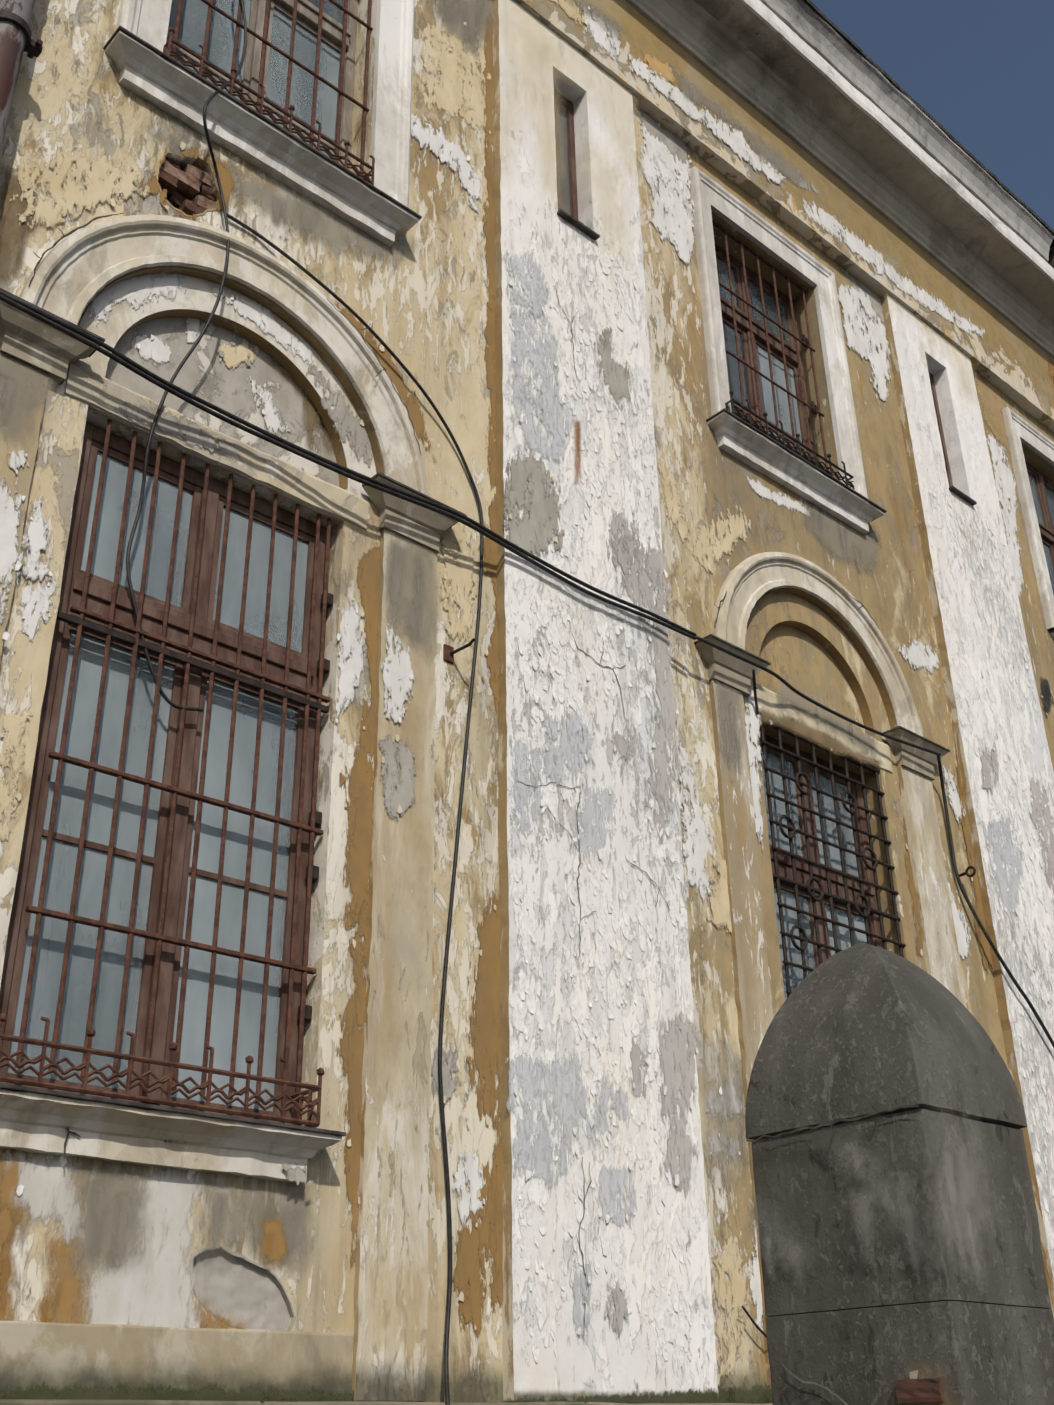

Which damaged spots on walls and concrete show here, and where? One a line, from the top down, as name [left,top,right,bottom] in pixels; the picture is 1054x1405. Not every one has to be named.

peeling [9,142,236,229]
peeling [551,0,985,401]
peeling [134,318,202,365]
peeling [210,284,373,467]
peeling [0,450,60,643]
peeling [926,370,1027,614]
peeling [411,16,751,1371]
peeling [332,542,424,1267]
peeling [898,630,1054,1254]
peeling [6,1150,85,1243]
peeling [82,1168,296,1331]
peeling [710,1203,764,1386]